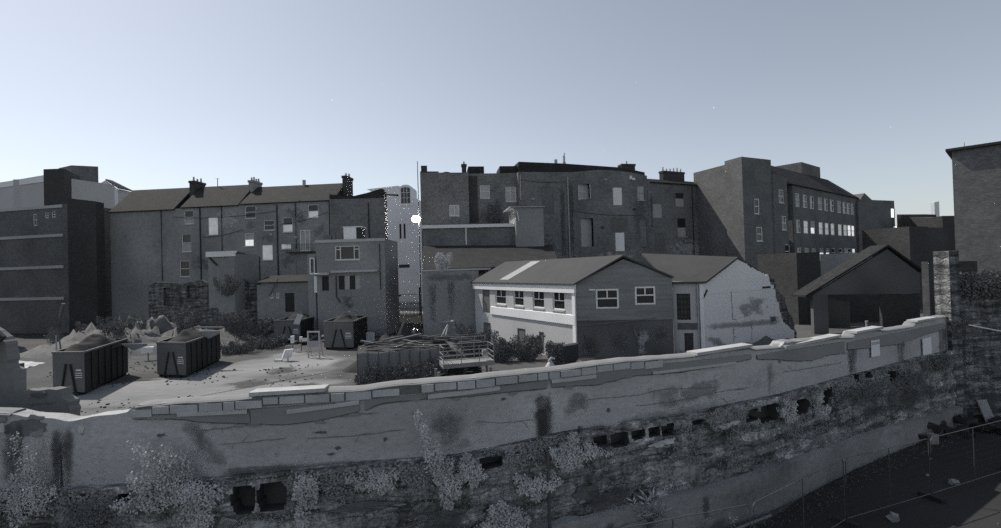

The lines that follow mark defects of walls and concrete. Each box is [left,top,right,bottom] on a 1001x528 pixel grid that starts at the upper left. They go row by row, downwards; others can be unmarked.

leakage [536,396,551,437]
leakage [52,432,72,475]